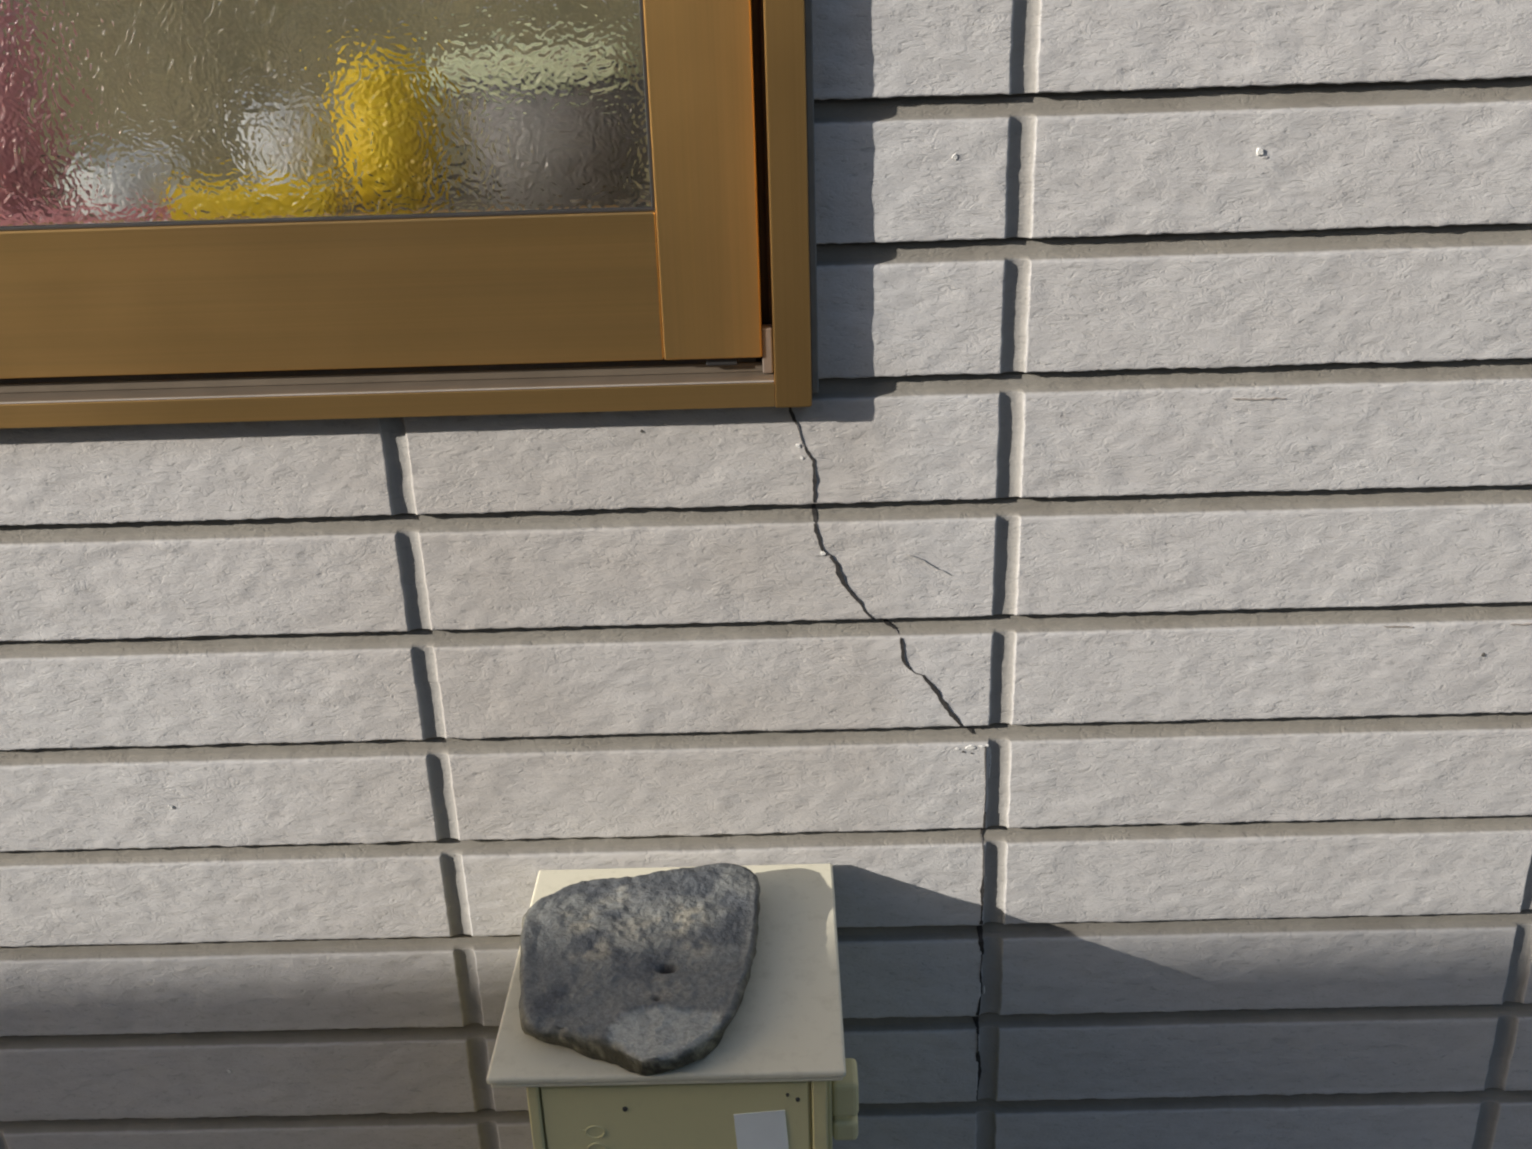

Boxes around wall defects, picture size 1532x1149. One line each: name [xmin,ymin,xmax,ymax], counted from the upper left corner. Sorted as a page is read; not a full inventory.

crack [789,407,991,1100]